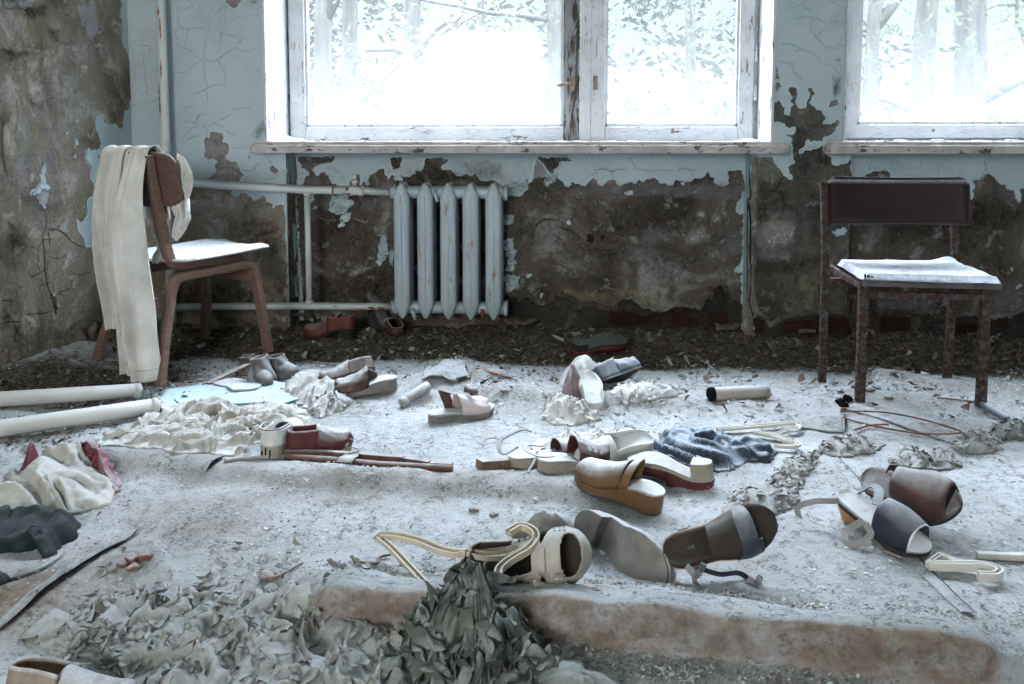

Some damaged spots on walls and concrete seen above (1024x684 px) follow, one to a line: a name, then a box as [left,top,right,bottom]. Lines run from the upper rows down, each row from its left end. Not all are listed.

crack [780,1,844,82]
crack [1,211,90,324]
peeling [0,0,131,368]
peeling [144,216,157,248]
peeling [151,66,1024,339]